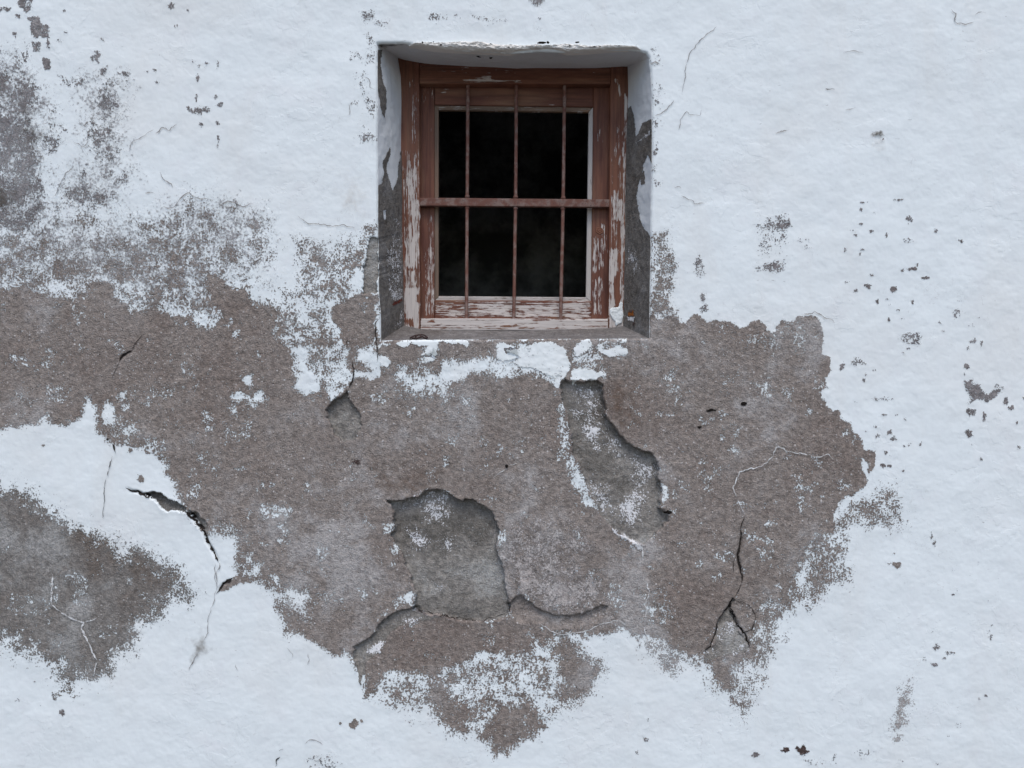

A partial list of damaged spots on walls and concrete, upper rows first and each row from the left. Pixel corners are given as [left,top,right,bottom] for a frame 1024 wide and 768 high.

flaking render [0,55,48,238]
peeling [27,16,51,52]
flaking render [84,71,133,186]
peeling [186,60,223,148]
flaking render [350,9,388,144]
crack [112,338,140,377]
crack [103,444,152,509]
flaking render [0,106,908,765]
peeling [964,363,1024,424]
crack [185,511,233,668]
crack [705,445,833,652]